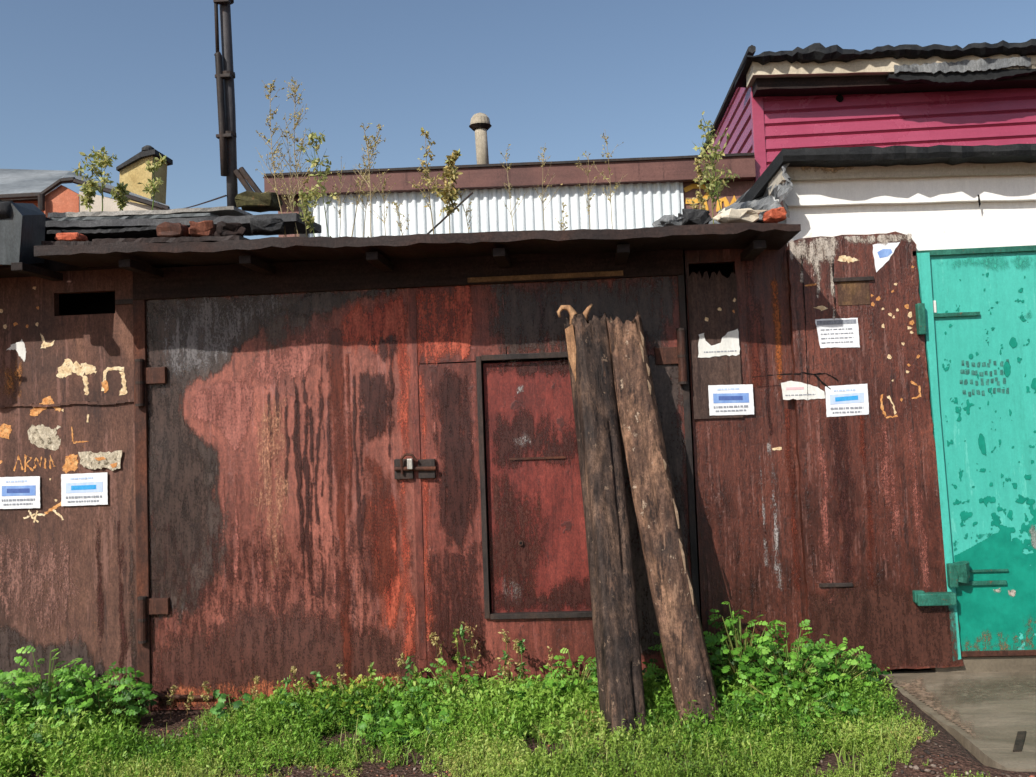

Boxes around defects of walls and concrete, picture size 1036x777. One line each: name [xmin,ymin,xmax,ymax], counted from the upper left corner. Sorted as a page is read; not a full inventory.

rust [0,535,79,635]
rust [95,522,104,645]
rust [117,521,137,706]
rust [151,286,473,709]
rust [739,260,800,590]
rust [818,415,900,588]
rust [913,474,929,587]
peeling [945,301,1036,651]
rust [965,620,1036,651]